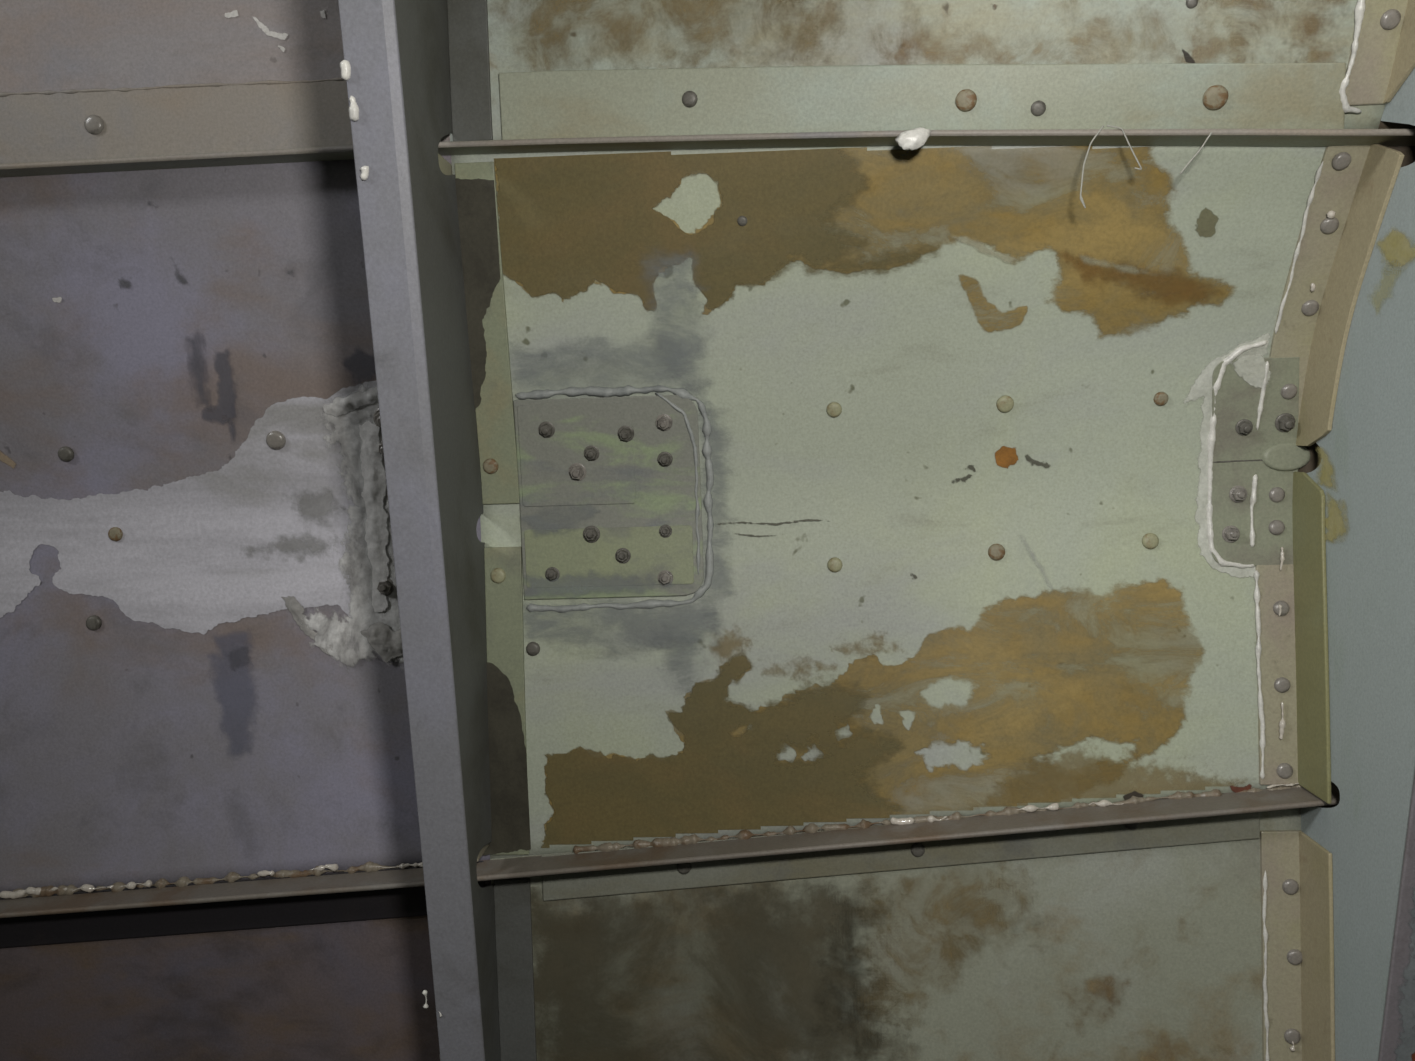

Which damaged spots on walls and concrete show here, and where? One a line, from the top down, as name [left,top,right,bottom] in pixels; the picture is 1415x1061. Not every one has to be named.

peeling [0,381,377,635]
damp [203,351,235,437]
corrosion [995,446,1018,468]
damp [531,883,915,1061]